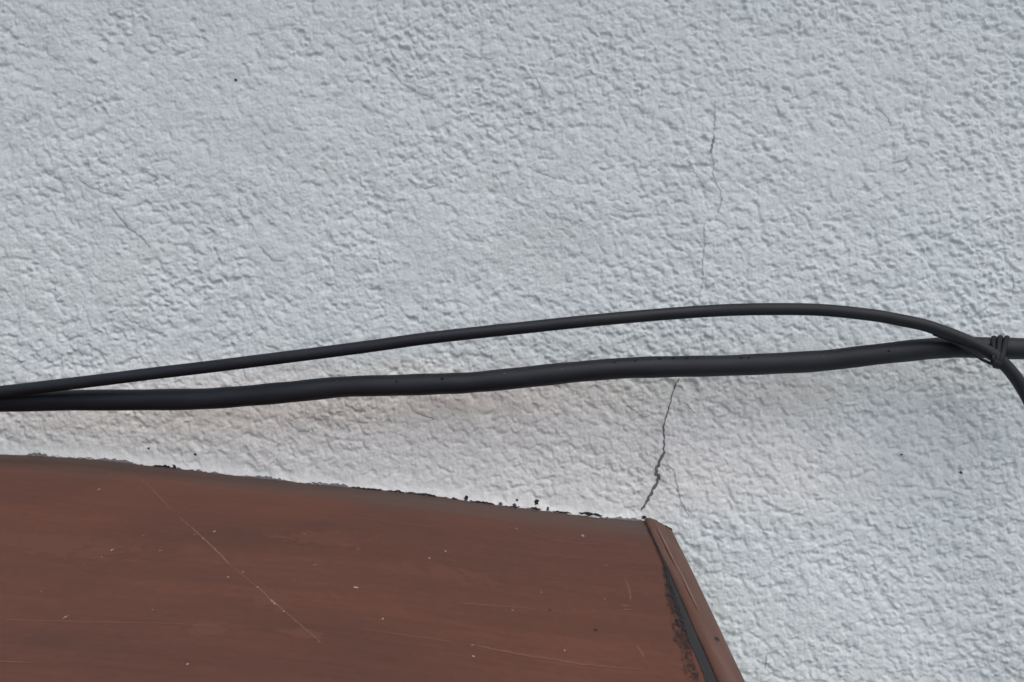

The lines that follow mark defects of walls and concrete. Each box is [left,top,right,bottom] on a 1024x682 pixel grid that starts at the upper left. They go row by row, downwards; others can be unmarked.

crack [626,379,696,517]